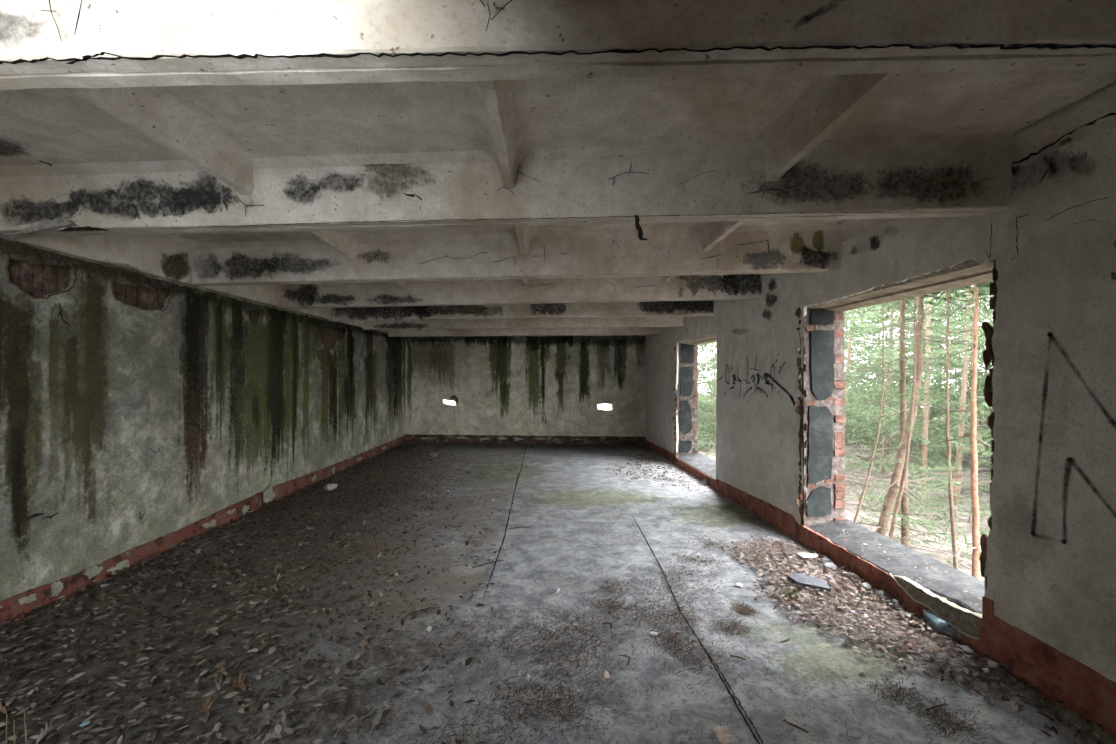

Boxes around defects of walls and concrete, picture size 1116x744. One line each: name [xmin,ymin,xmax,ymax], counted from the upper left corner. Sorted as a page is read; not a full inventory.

crack [0,44,1116,64]
crack [1012,113,1116,182]
leakage [2,172,232,225]
leakage [285,174,359,202]
leakage [760,166,986,204]
crack [187,196,1113,260]
leakage [790,231,838,269]
leakage [0,238,646,547]
flaking render [982,322,995,430]
peeling [18,581,63,605]
peeling [84,560,129,579]
flaking render [979,516,992,589]